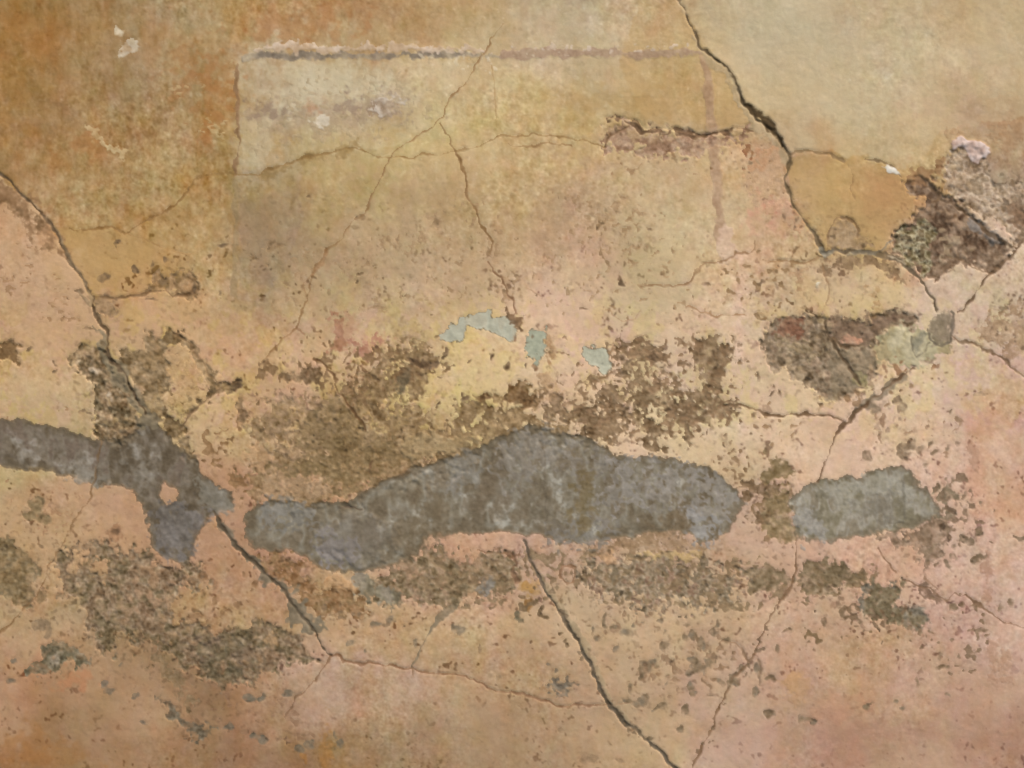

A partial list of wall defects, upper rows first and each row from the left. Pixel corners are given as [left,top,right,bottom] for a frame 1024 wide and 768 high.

crack [0,23,605,433]
spalling [599,55,1024,412]
crack [605,0,1024,484]
crack [0,440,103,635]
spalling [0,184,997,754]
crack [214,430,798,768]
crack [877,547,1024,629]